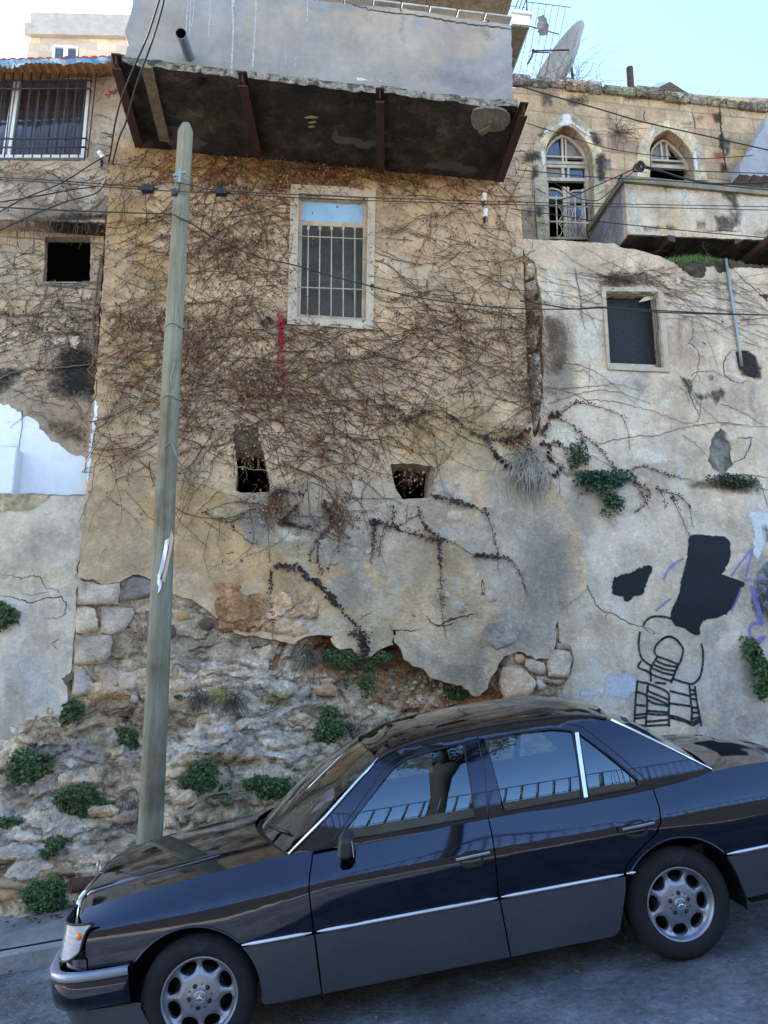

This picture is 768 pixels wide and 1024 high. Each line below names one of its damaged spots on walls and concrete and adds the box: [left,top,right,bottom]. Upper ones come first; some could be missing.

peeling [51,336,80,349]
leakage [737,352,761,378]
peeling [0,403,87,512]
spalling [708,429,738,474]
crack [1,557,80,648]